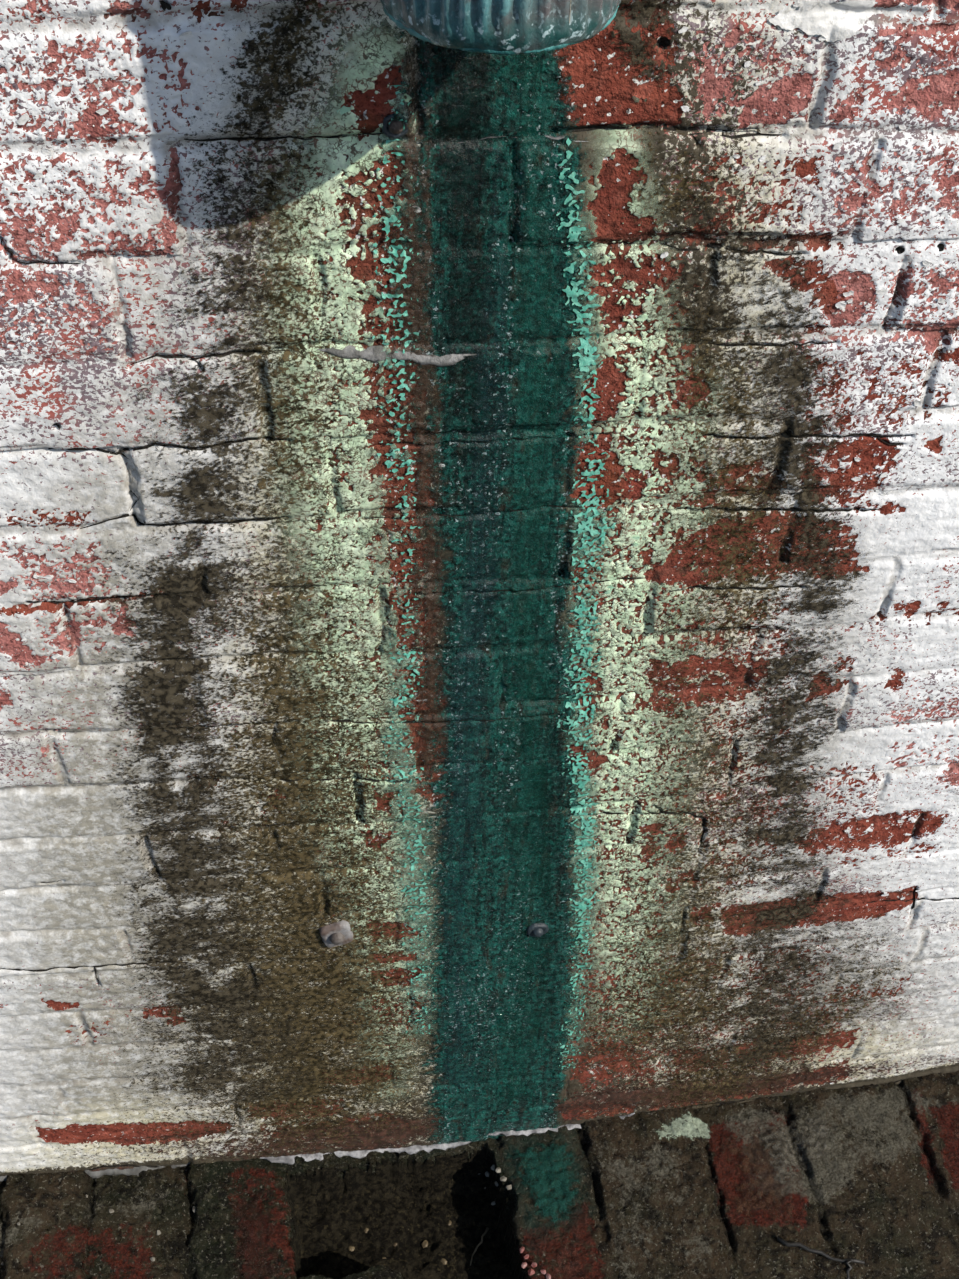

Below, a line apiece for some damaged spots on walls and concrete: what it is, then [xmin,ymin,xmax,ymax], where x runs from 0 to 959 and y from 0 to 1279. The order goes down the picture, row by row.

peeling [0,0,248,363]
crack [48,437,287,459]
crack [703,433,912,445]
crack [80,491,286,529]
crack [677,506,879,514]
peeling [552,0,959,1120]
peeling [0,508,165,711]
peeling [248,59,455,1142]
peeling [36,1117,232,1147]
leakage [514,1143,579,1223]
leakage [655,1111,710,1141]
leakage [759,1113,831,1200]